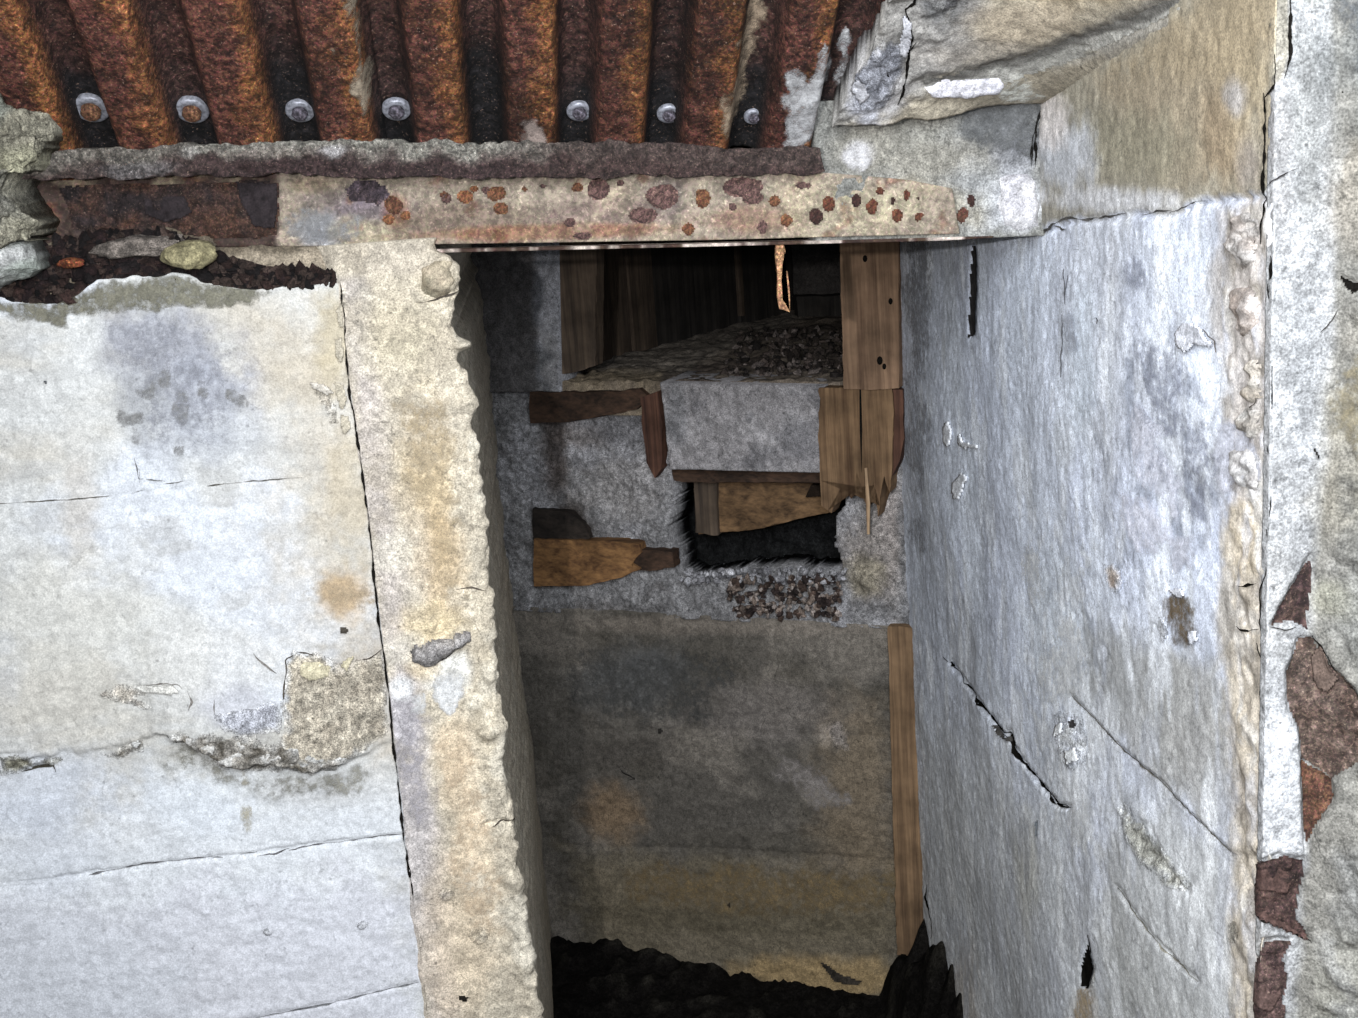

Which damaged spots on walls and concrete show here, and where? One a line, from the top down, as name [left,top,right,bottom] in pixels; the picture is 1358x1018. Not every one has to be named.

crack [871,0,916,104]
corrosion [432,175,508,214]
corrosion [628,184,680,224]
corrosion [696,176,793,234]
corrosion [809,196,835,225]
corrosion [852,187,924,223]
corrosion [956,195,976,224]
crack [1254,0,1295,299]
crack [90,284,453,1018]
crack [1236,569,1358,696]
spalling [167,650,389,775]
crack [943,657,1071,808]